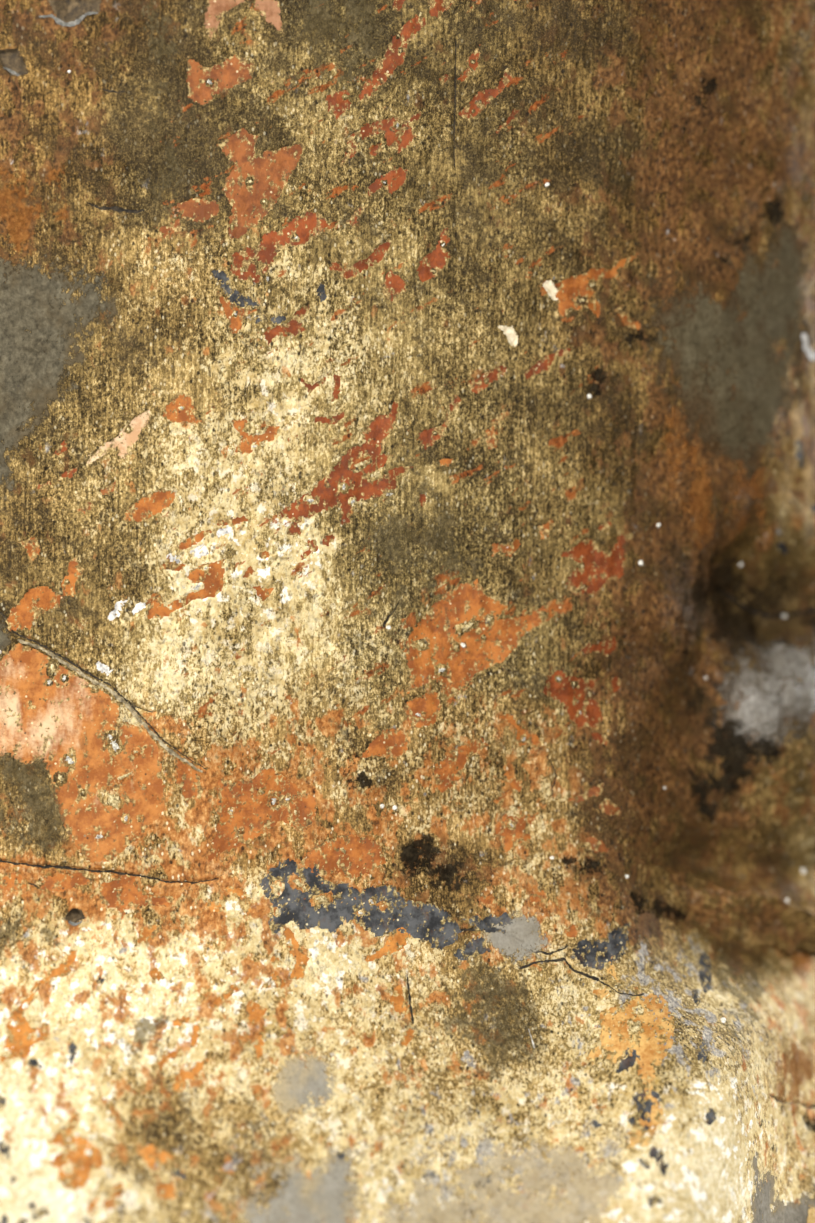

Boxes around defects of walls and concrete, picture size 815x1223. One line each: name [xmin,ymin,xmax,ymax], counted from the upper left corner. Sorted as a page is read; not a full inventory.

peeling [204,0,283,39]
peeling [186,55,255,105]
peeling [159,128,328,284]
peeling [301,375,345,424]
water stain [589,367,607,396]
crack [0,612,206,773]
water stain [676,550,815,821]
crack [0,860,219,889]
water stain [560,856,609,874]
water stain [627,892,688,922]
peeling [270,928,309,988]
crack [769,1094,815,1109]